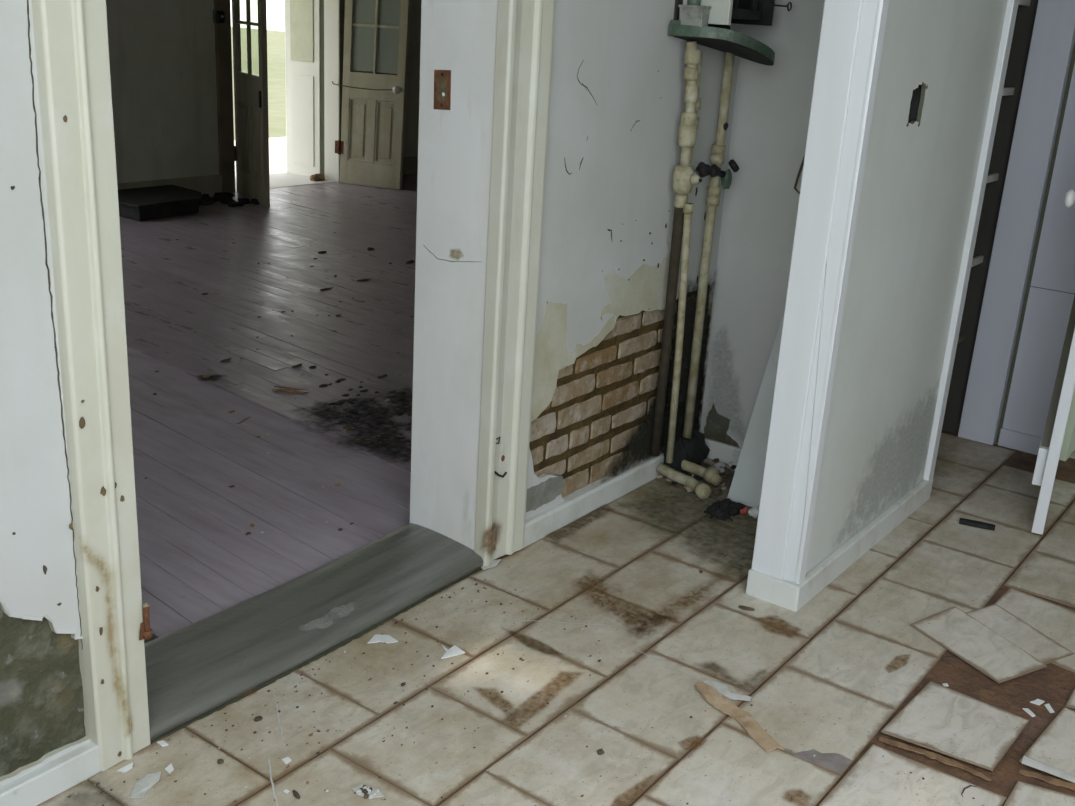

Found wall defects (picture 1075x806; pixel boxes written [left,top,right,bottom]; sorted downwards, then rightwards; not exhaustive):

flaking render [529,236,698,498]
peeling [0,599,86,777]
peeling [1022,699,1055,717]